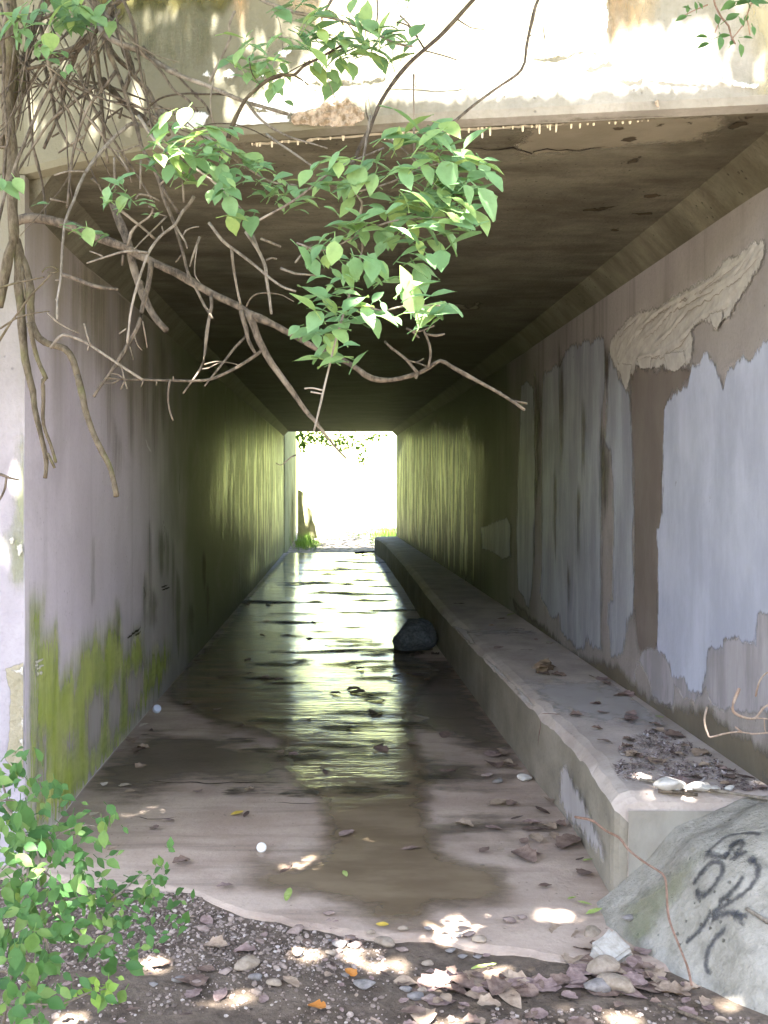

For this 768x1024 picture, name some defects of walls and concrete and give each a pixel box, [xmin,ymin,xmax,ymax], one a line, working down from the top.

crack [478,146,600,154]
peeling [482,239,768,713]